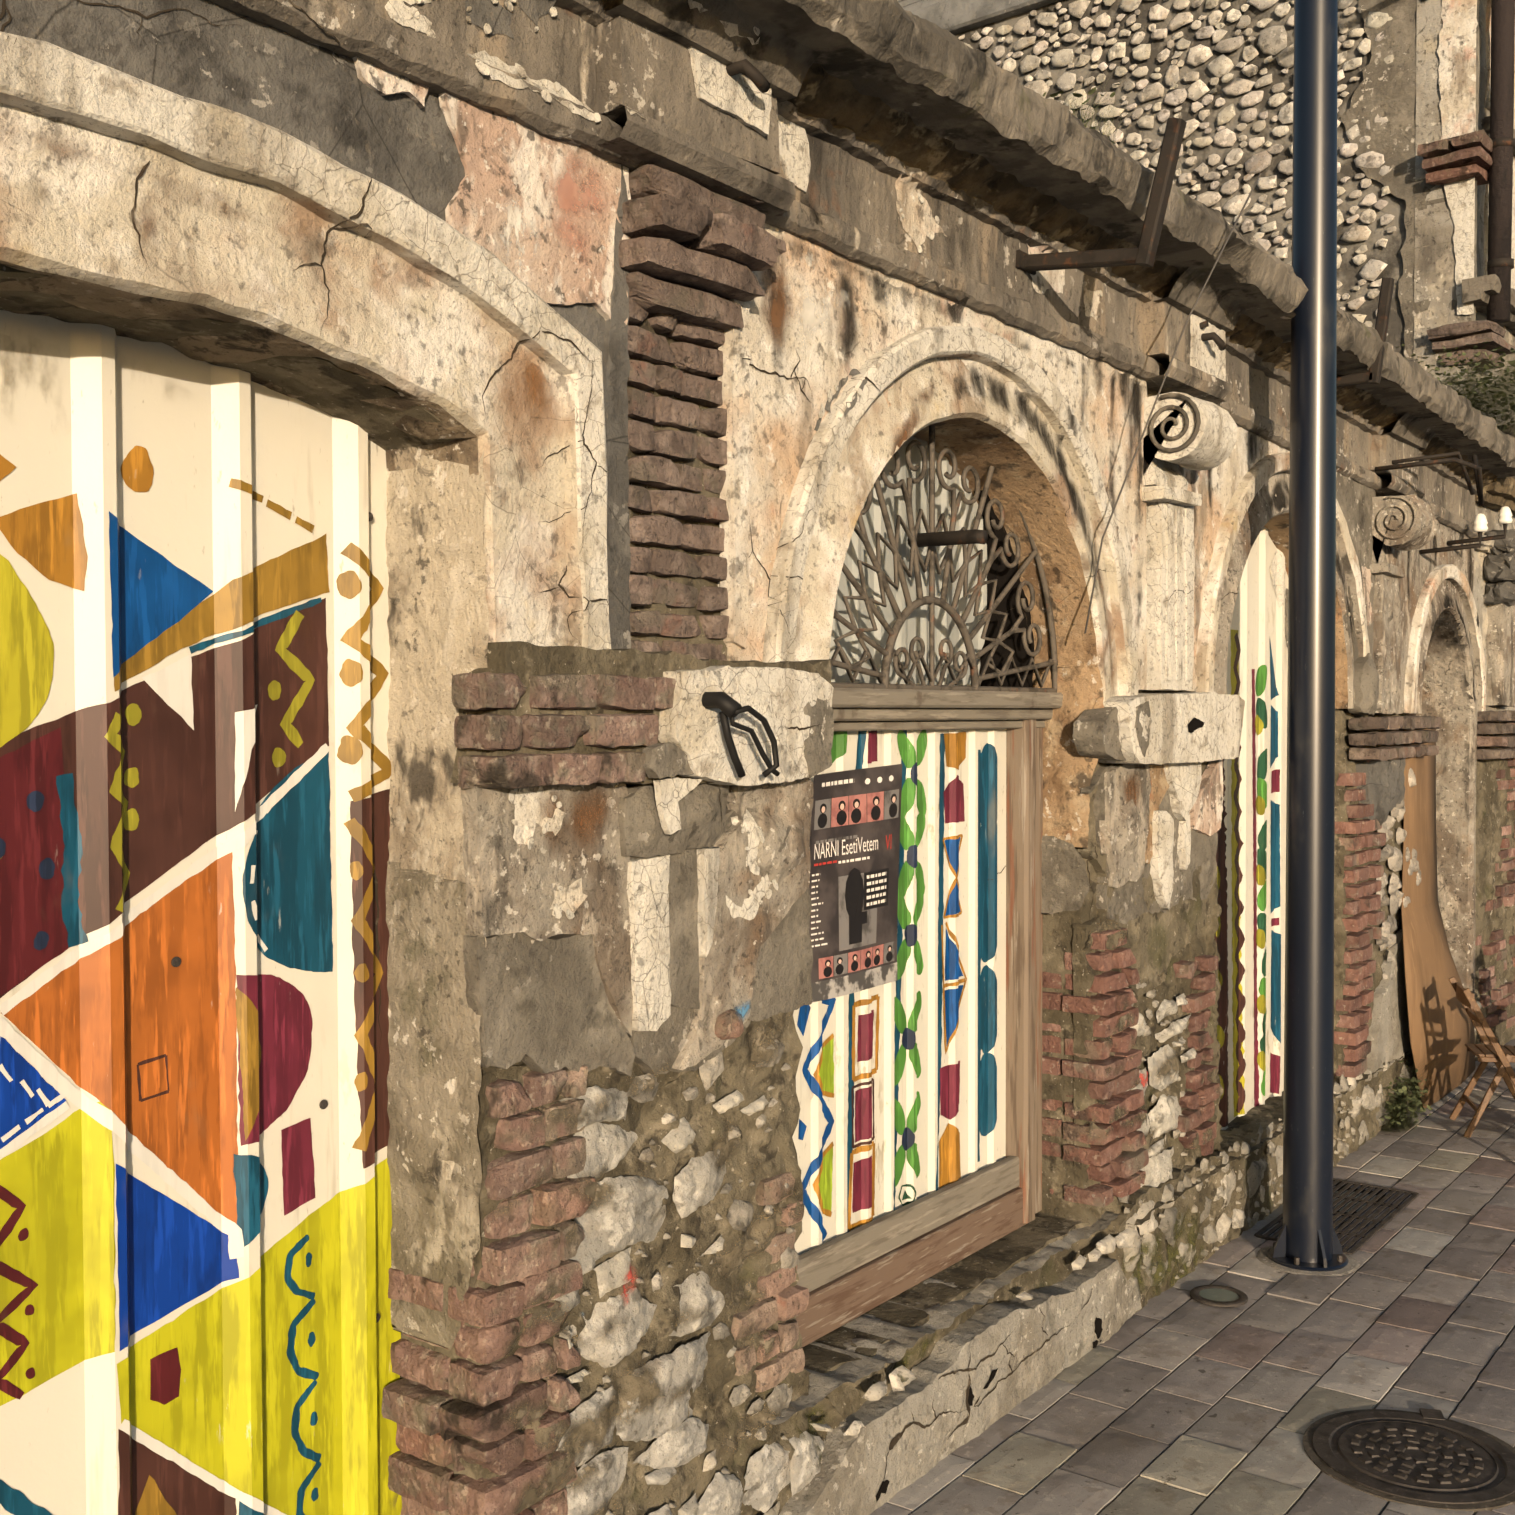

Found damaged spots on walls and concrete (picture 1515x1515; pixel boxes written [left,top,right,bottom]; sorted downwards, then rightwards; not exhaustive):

peeling [385,0,436,38]
crack [131,161,151,272]
crack [295,178,372,335]
spalling [642,743,694,778]
peeling [509,786,567,850]
peeling [550,878,587,919]
peeling [726,809,778,920]
spalling [1334,750,1421,1084]
spalling [1475,758,1515,1045]
spalling [1042,904,1223,1220]
crack [884,1288,1093,1478]